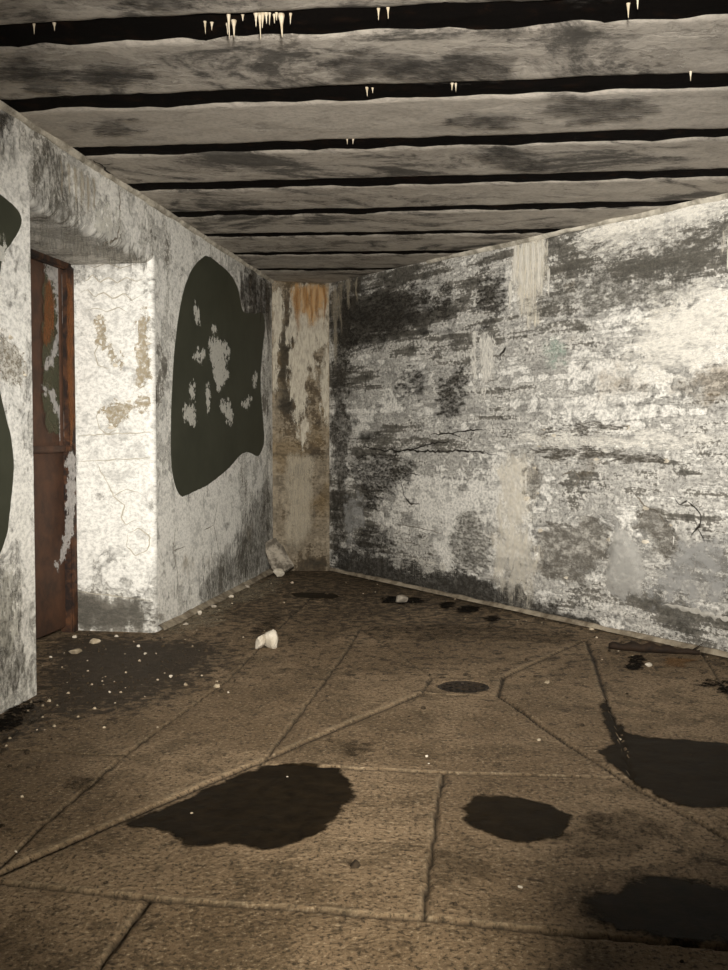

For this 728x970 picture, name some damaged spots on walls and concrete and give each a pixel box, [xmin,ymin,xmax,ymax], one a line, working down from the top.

peeling [0,195,22,271]
water stain [476,199,728,382]
spalling [0,335,27,386]
peeling [171,256,265,497]
corrosion [285,283,329,450]
peeling [0,393,14,553]
water stain [319,278,600,625]
water stain [519,427,728,452]
water stain [126,763,356,850]
water stain [461,795,572,843]
water stain [598,700,728,808]
water stain [580,875,728,948]